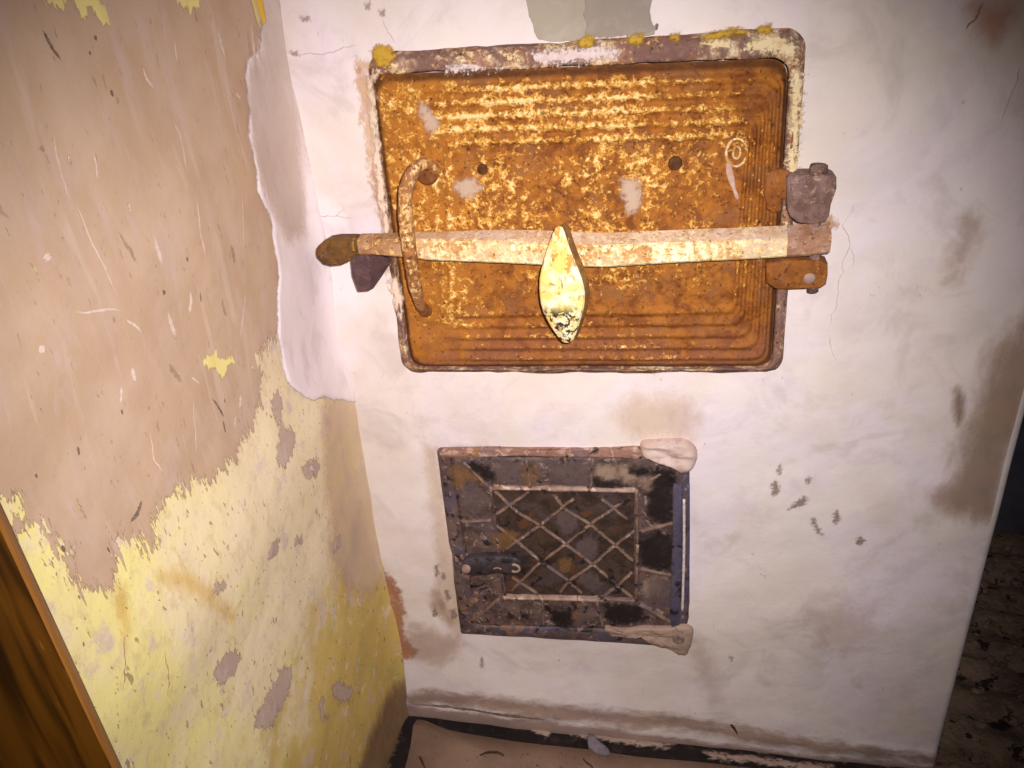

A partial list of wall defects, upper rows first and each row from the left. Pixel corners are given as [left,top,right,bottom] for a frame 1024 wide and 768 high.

rust [356,62,384,227]
crack [829,205,855,361]
leakage [939,328,1024,515]
flaking render [384,572,416,660]
leakage [362,685,943,768]